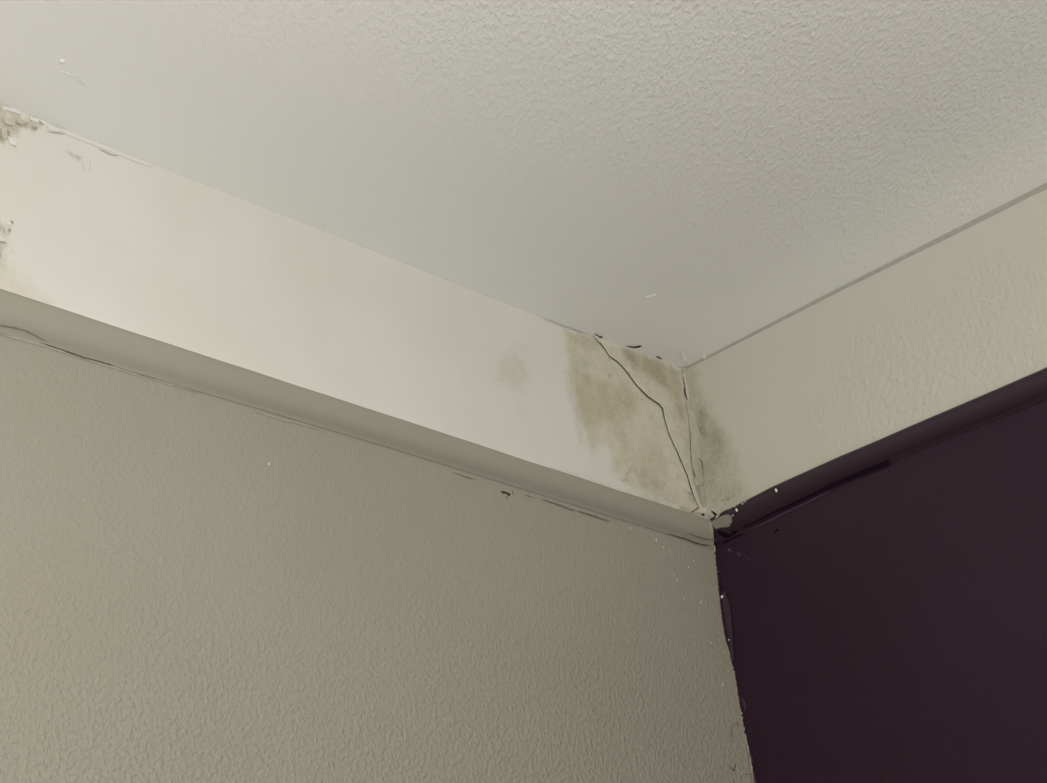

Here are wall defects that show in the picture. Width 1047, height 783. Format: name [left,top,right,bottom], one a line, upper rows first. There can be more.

peeling [0,104,152,167]
crack [543,318,714,546]